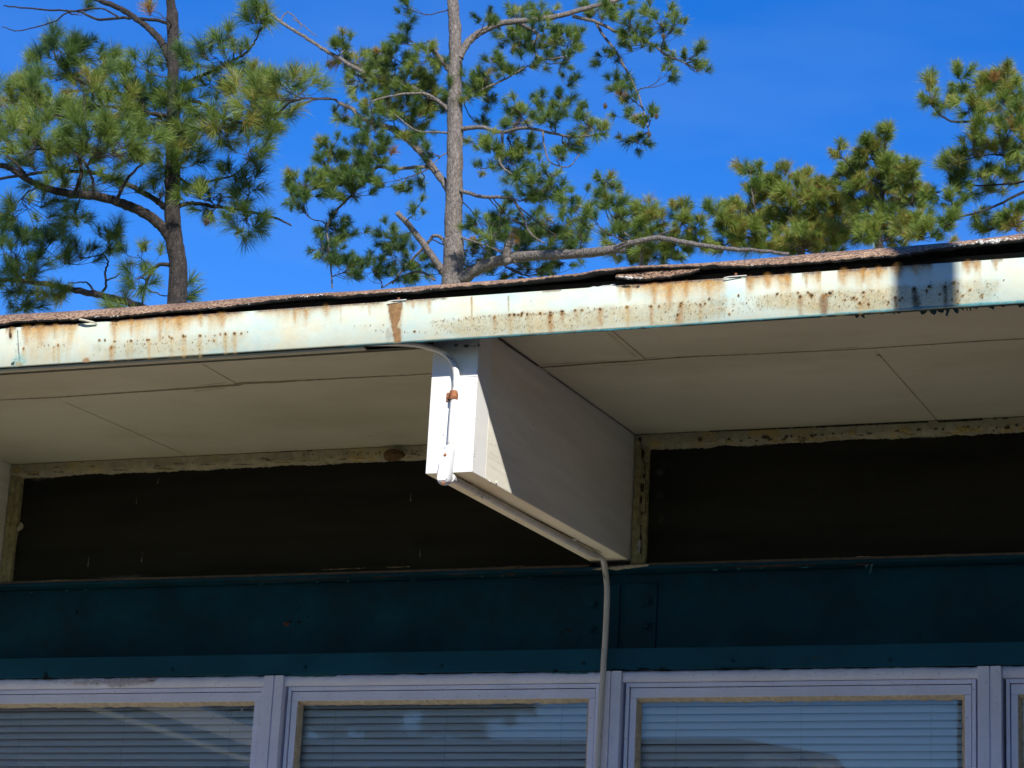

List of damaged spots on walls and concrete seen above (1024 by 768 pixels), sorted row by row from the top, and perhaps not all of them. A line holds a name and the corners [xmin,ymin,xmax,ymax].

rust [839,263,931,275]
rust [113,312,239,326]
rust [259,297,445,343]
rust [620,278,750,321]
peeling [508,282,1024,334]
rust [746,271,963,316]
rust [7,323,77,365]